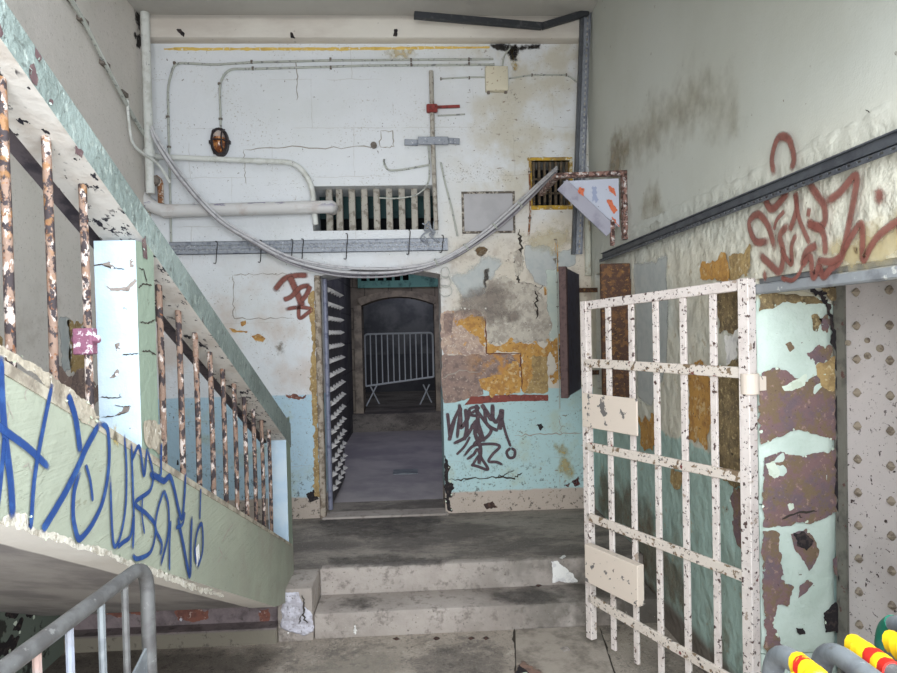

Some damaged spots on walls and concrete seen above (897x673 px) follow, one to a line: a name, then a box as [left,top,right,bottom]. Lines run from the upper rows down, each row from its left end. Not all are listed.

peeling [130,236,148,267]
flaking render [440,250,560,403]
crack [513,229,543,318]
peeling [698,244,751,282]
flaking render [717,291,739,367]
spalling [759,286,837,333]
spalling [0,320,99,424]
flaking render [688,360,740,471]
crack [453,471,522,481]
peeling [723,479,741,548]
peeling [757,345,839,653]
spalling [280,592,314,636]